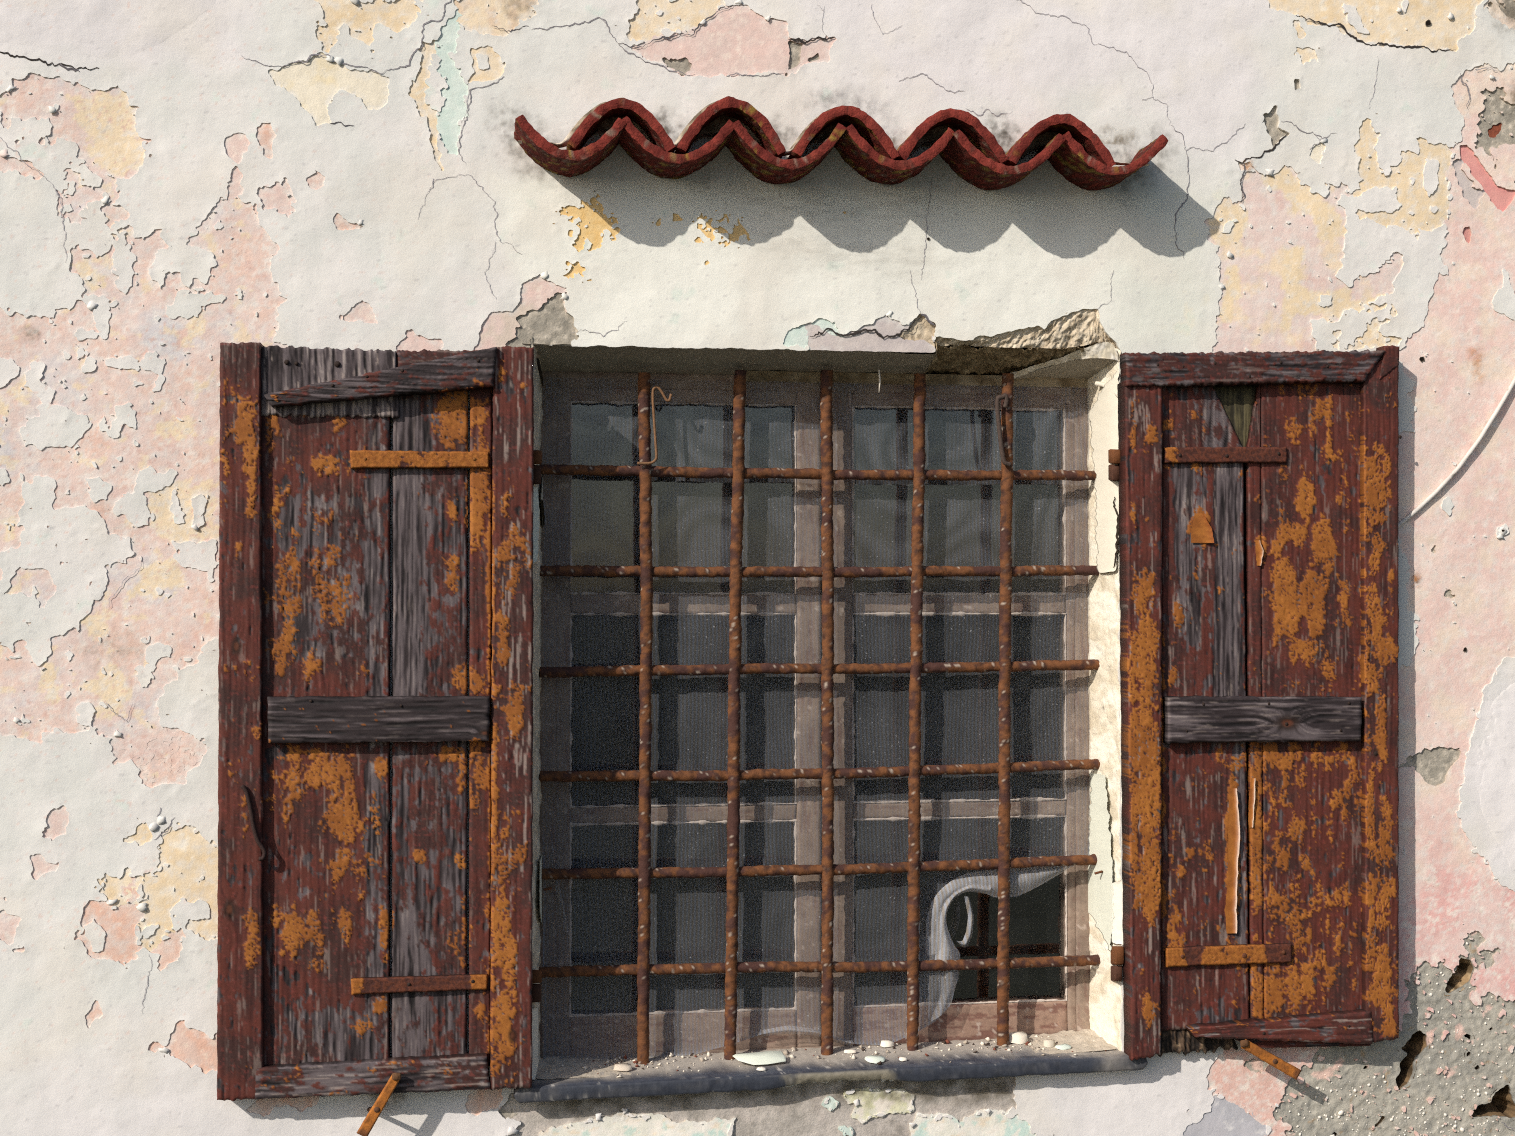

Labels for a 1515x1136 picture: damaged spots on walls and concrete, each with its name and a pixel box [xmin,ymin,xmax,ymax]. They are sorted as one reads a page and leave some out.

crack [0,51,99,72]
peeling [615,0,837,78]
crack [1021,0,1330,258]
peeling [652,210,750,265]
spalling [783,309,1118,380]
peeling [0,73,325,788]
peeling [1183,63,1515,1136]
peeling [30,805,69,880]
peeling [0,897,25,953]
peeling [74,816,218,971]
peeling [85,1000,103,1028]